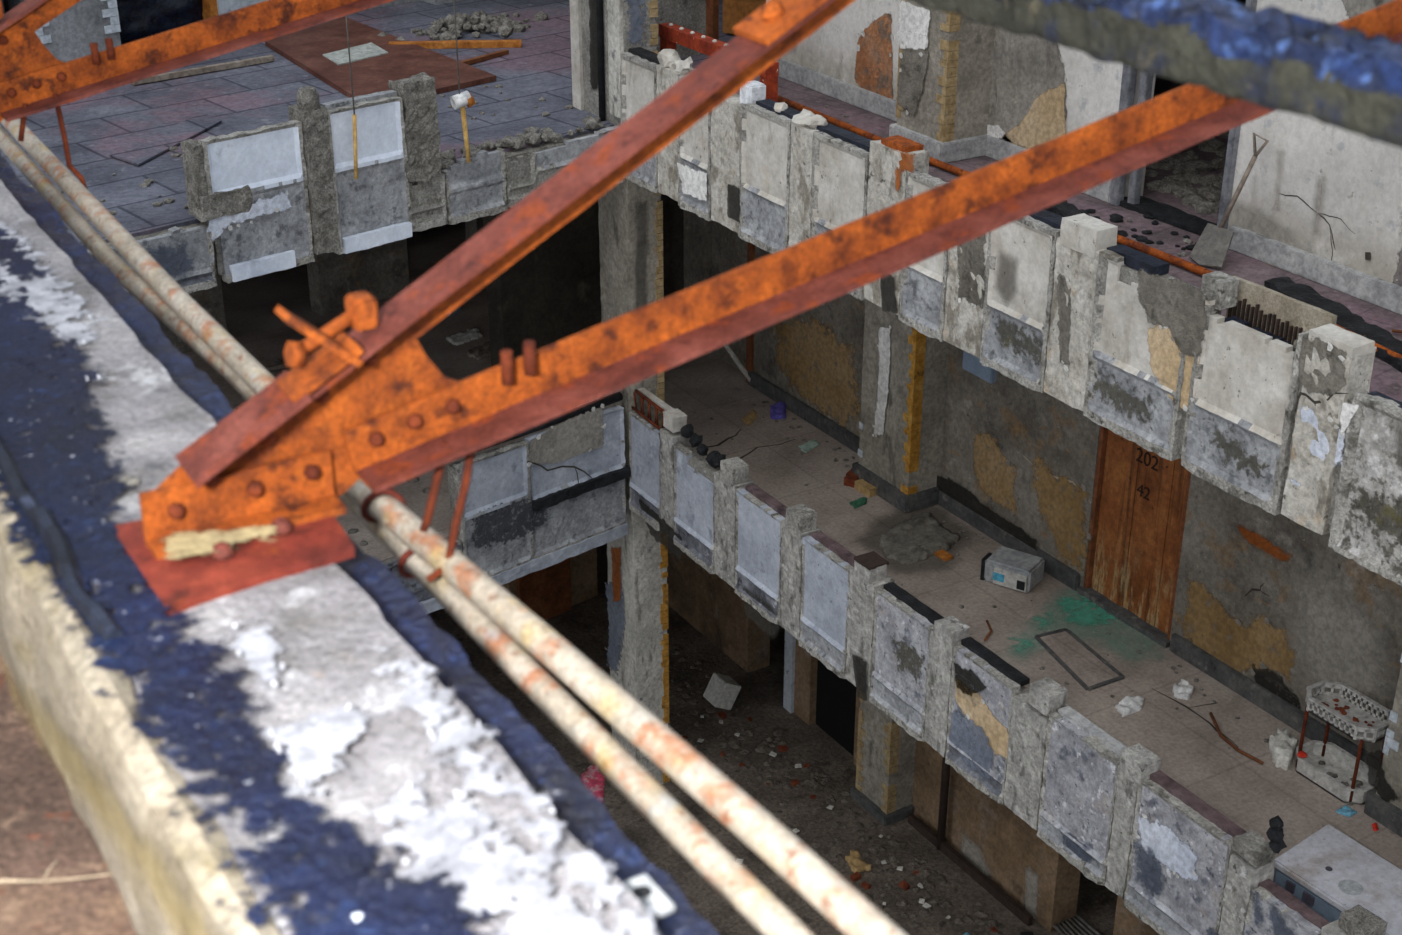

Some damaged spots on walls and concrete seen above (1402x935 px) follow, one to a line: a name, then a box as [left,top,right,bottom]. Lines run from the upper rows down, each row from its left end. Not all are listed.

peeling [854,0,930,116]
corrosion [894,150,914,191]
peeling [1393,205,1402,286]
spalling [1137,269,1207,412]
water stain [1092,369,1152,430]
water stain [1202,418,1270,486]
peeling [972,432,1091,577]
corrosion [611,547,621,602]
peeling [229,622,292,691]
peeling [1183,581,1295,683]
peeling [949,678,1009,781]
peeling [260,646,664,935]